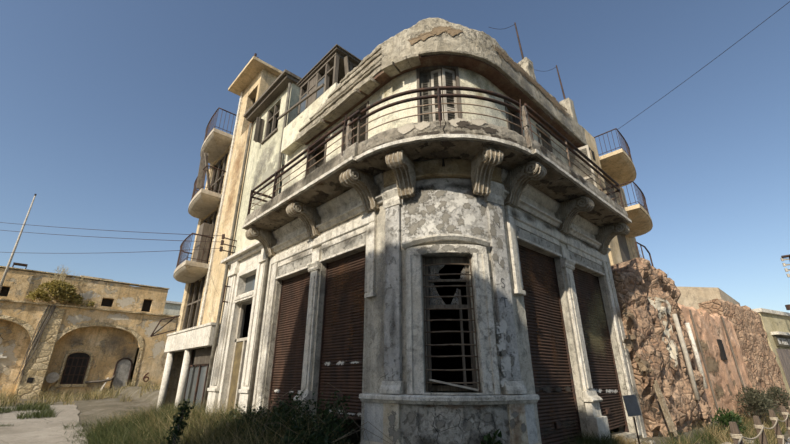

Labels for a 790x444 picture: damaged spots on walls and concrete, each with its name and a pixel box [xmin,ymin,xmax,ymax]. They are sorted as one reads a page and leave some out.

spalling [408,26,463,45]
spalling [377,117,517,147]
peeling [402,185,505,268]
peeling [494,316,514,387]
peeling [647,294,678,367]